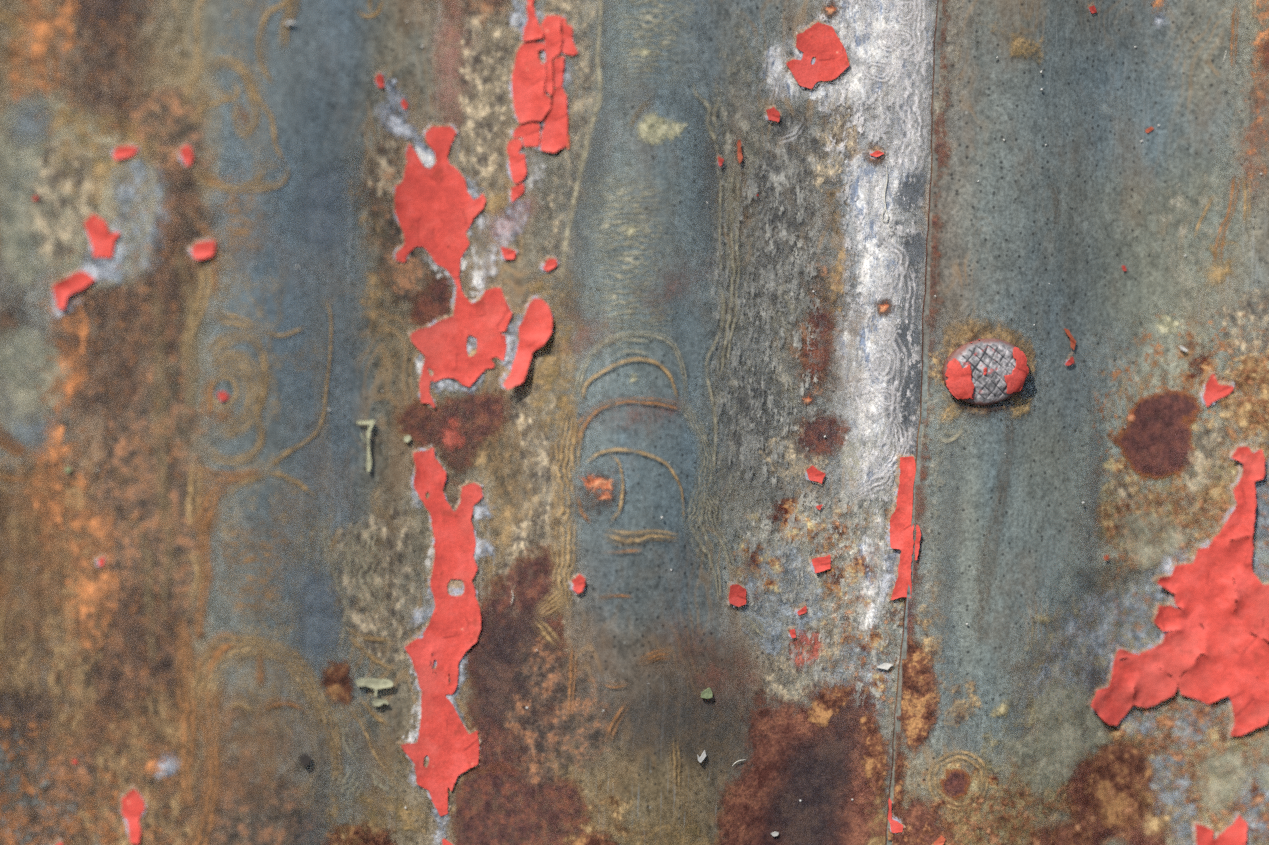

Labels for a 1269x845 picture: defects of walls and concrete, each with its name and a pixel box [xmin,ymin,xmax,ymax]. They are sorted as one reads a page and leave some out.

rust [8,0,75,104]
peeling [786,1,850,91]
peeling [392,122,554,408]
peeling [539,255,560,271]
rust [0,89,219,845]
peeling [397,445,484,817]
rust [320,0,1269,845]
peeling [885,453,921,601]
peeling [945,358,987,399]
peeling [1004,347,1029,394]
peeling [1087,443,1269,737]
peeling [1191,812,1248,845]